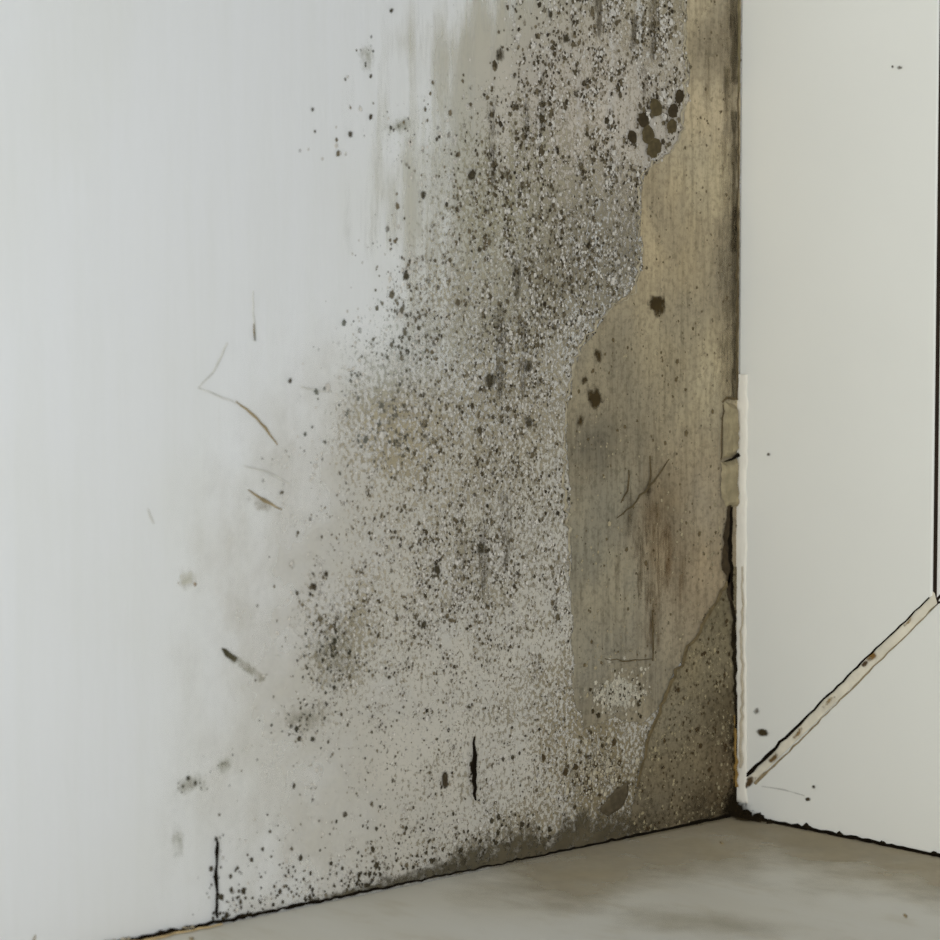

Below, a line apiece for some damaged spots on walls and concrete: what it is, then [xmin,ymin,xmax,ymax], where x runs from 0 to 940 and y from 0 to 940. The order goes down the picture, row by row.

crack [113,505,738,940]
water stain [208,0,940,921]
peeling [561,0,741,840]
crack [734,0,742,399]